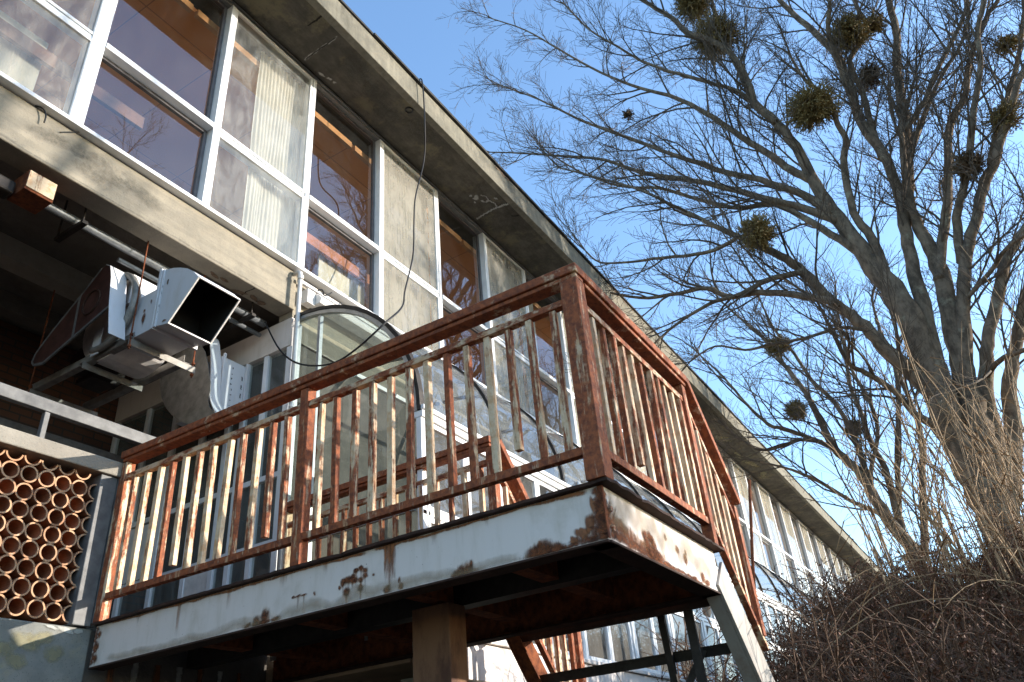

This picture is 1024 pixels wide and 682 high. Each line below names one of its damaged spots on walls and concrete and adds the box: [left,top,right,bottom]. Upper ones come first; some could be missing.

corrosion [112,486,710,623]